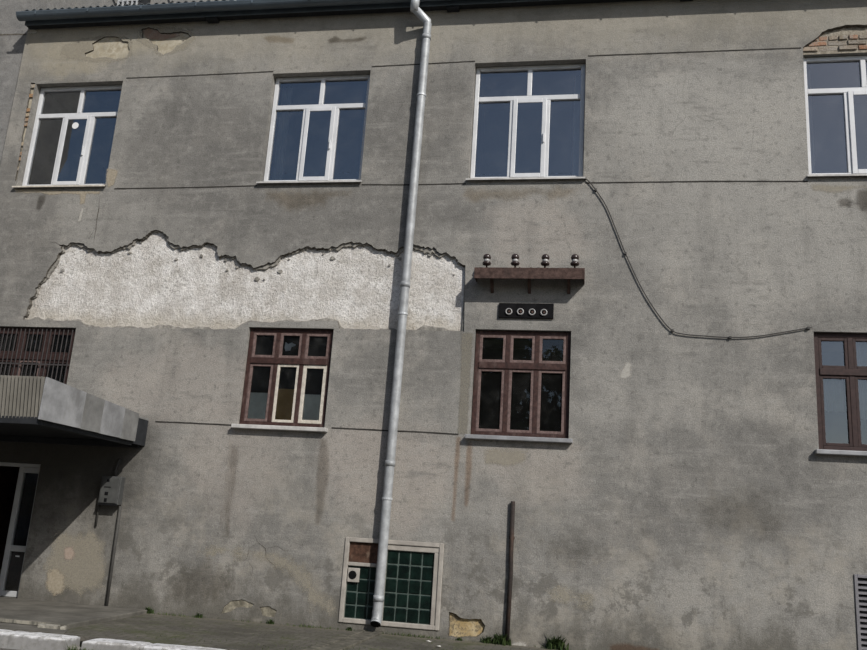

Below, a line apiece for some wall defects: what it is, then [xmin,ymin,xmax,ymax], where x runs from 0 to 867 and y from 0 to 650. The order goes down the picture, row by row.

spalling [62,27,194,62]
flaking render [803,24,867,55]
spalling [23,230,465,332]
spalling [448,612,485,638]